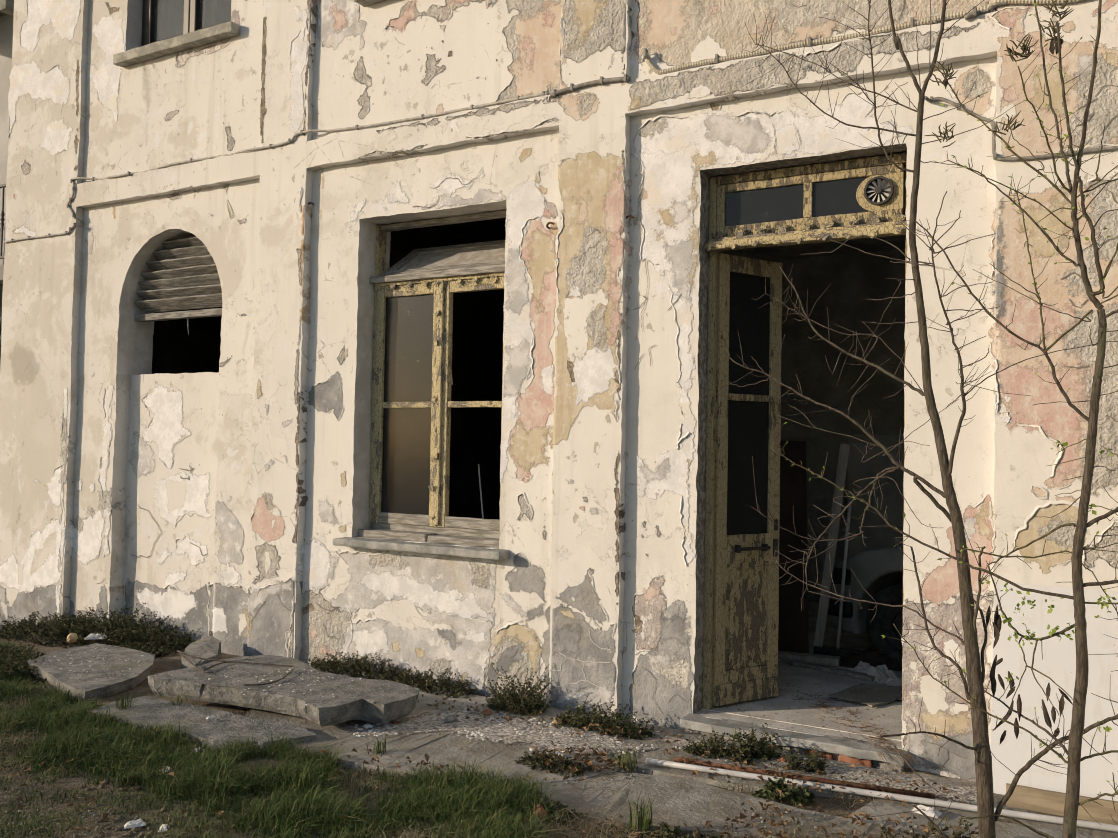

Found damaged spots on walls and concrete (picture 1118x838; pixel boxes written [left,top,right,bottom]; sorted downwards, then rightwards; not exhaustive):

peeling [8,0,125,171]
flaking render [289,0,372,136]
flaking render [385,0,1118,574]
peeling [129,310,347,588]
flaking render [502,453,666,655]
flaking render [903,494,995,782]